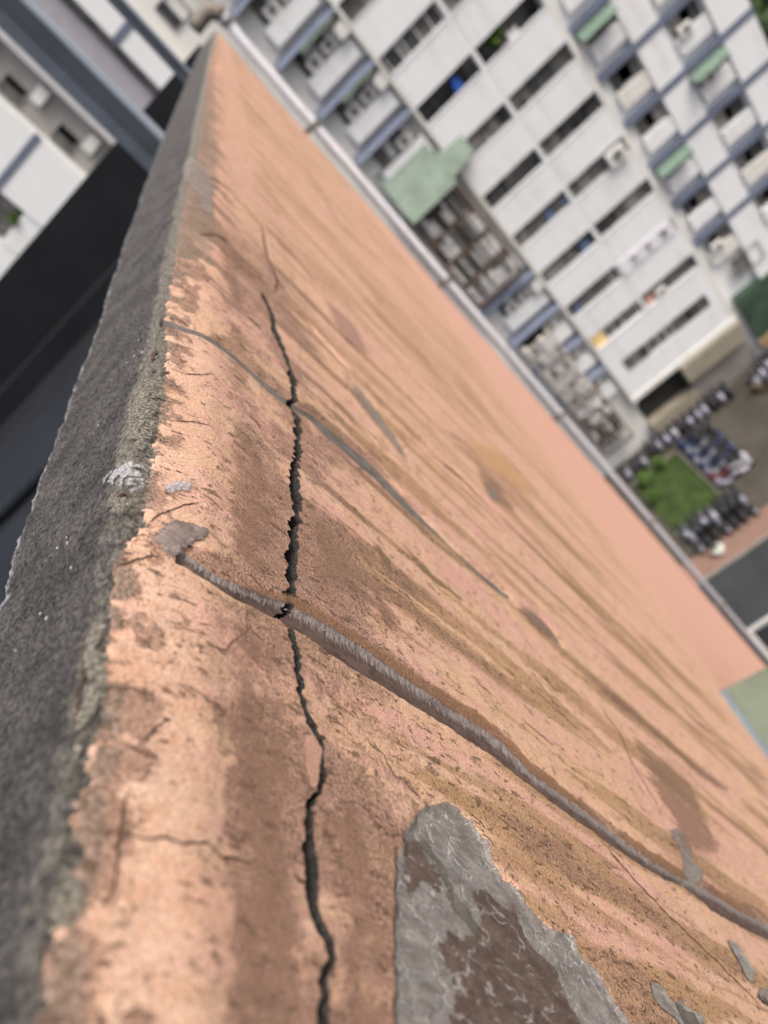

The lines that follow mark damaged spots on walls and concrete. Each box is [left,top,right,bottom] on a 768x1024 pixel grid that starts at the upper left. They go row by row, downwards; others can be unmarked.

crack [175,176,337,1024]
spalling [394,800,629,1024]
spalling [650,981,706,1024]